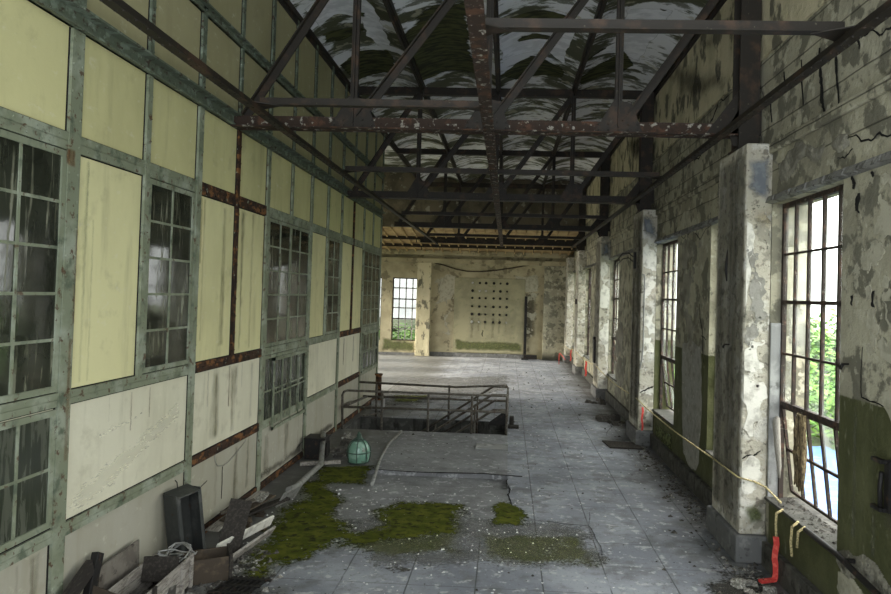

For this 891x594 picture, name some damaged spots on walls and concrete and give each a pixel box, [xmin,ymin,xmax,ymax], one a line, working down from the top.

crack [838,131,891,159]
flaking render [861,172,891,273]
flaking render [878,388,891,420]
flaking render [836,549,891,594]